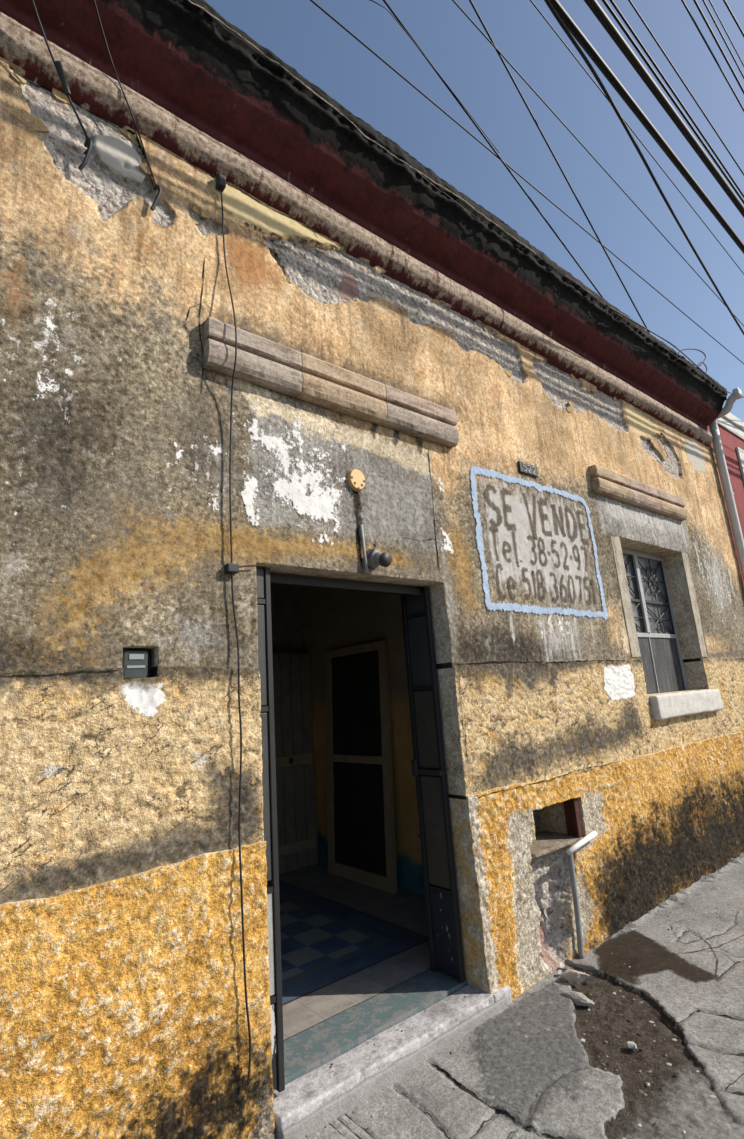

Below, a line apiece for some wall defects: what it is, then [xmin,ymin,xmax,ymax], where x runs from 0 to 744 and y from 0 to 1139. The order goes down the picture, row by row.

flaking render [11,67,705,479]
peeling [204,406,348,548]
peeling [442,530,454,554]
crack [670,911,744,980]
crack [657,1010,744,1095]
crack [395,1061,586,1139]